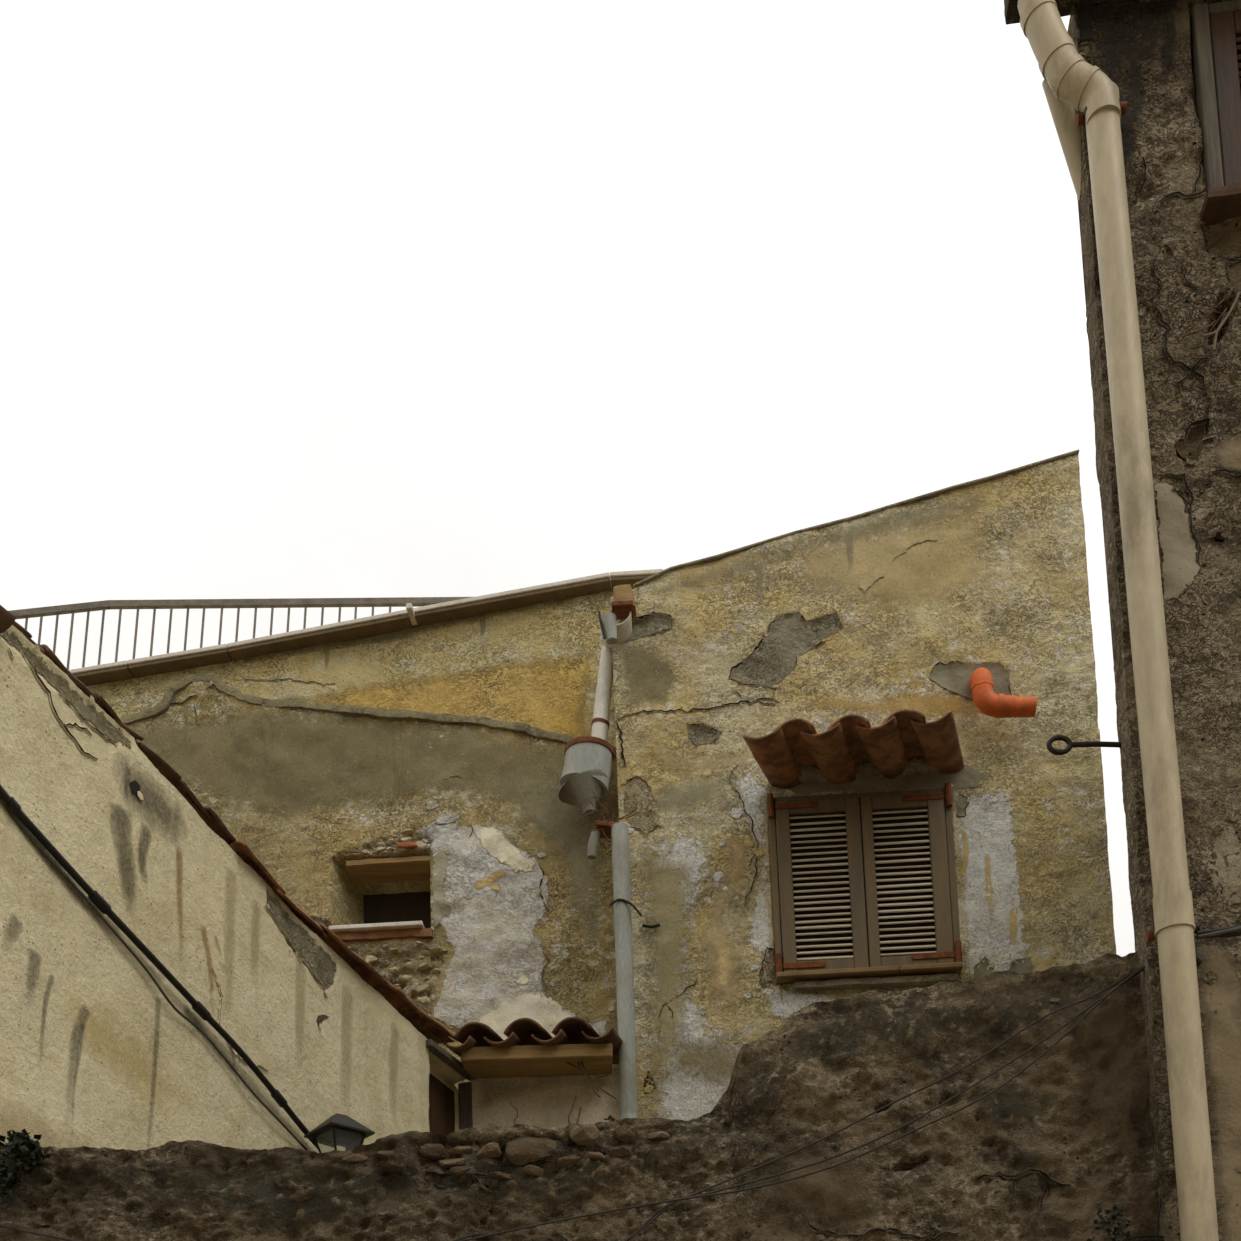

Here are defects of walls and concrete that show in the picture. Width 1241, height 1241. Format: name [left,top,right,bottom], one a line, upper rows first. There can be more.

spalling [1154,482,1231,605]
crack [8,645,98,760]
crack [169,678,336,726]
spalling [687,722,723,745]
spalling [729,611,843,689]
spalling [928,660,1012,700]
water stain [0,800,93,910]
water stain [113,770,178,897]
crack [729,766,759,917]
peeling [788,760,1032,978]
spalling [267,891,337,996]
peeling [342,773,901,1189]